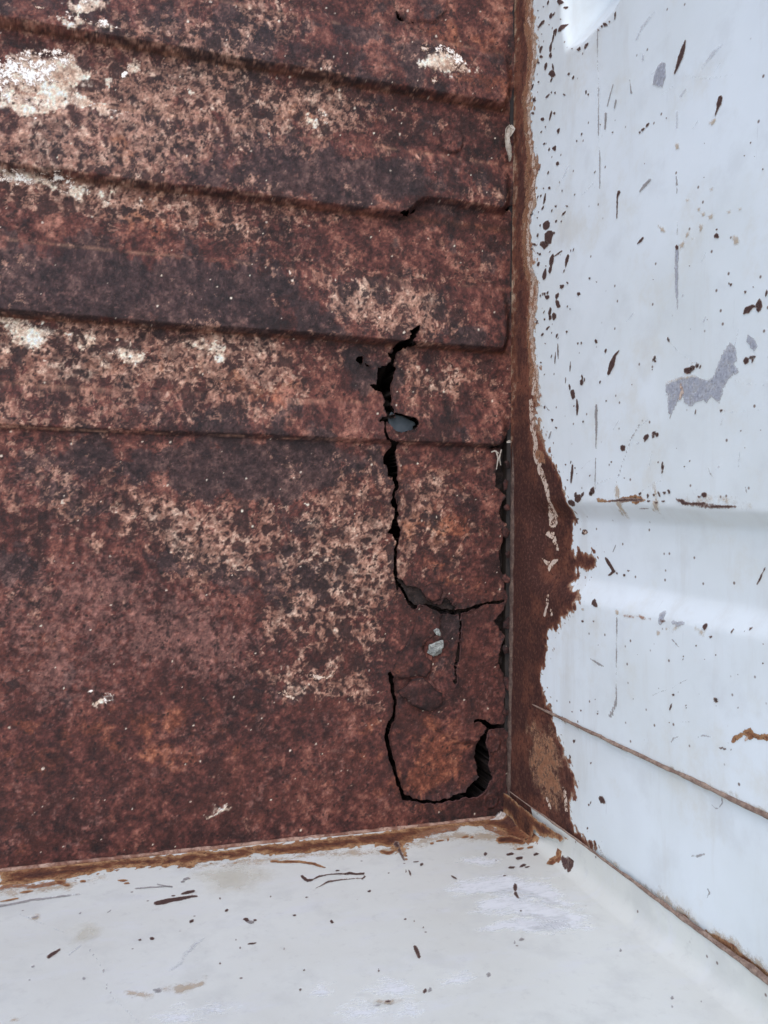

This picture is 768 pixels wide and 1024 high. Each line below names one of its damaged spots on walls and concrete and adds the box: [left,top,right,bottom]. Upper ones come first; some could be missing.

corrosion [674,243,684,309]
peeling [666,335,757,419]
corrosion [0,0,602,902]
crack [358,325,505,685]
corrosion [596,487,736,514]
crack [384,671,504,805]
corrosion [731,728,768,743]
corrosion [645,886,768,977]